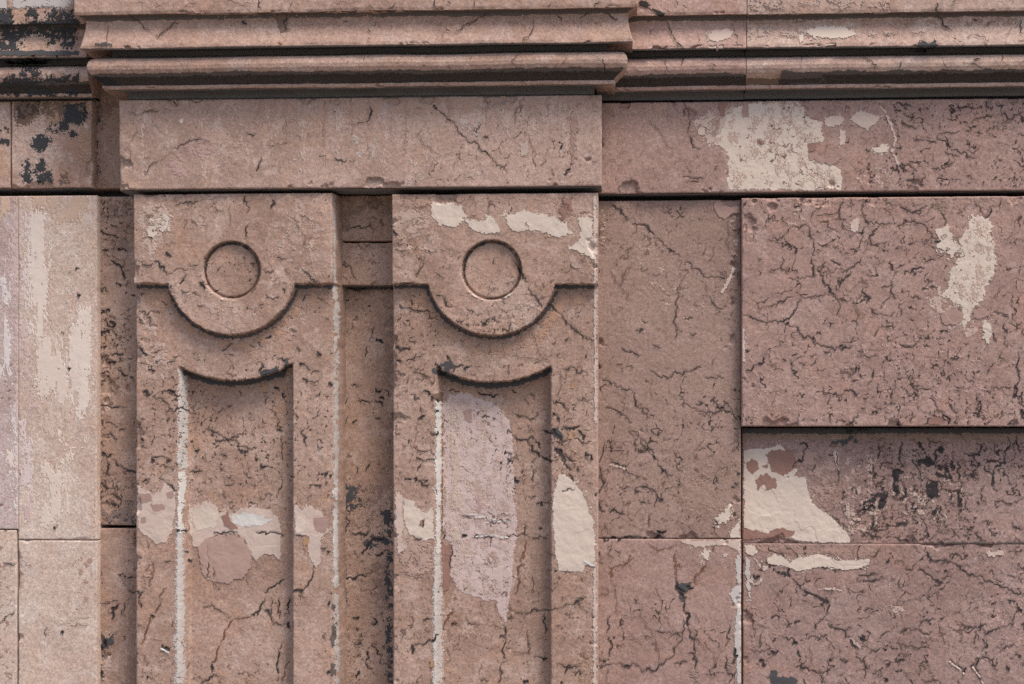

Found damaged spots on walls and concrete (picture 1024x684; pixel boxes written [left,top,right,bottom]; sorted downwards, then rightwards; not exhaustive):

peeling [808,143,839,165]
crack [70,99,1024,684]
peeling [119,427,331,568]
peeling [461,513,513,538]
peeling [732,447,889,509]
peeling [743,527,890,596]